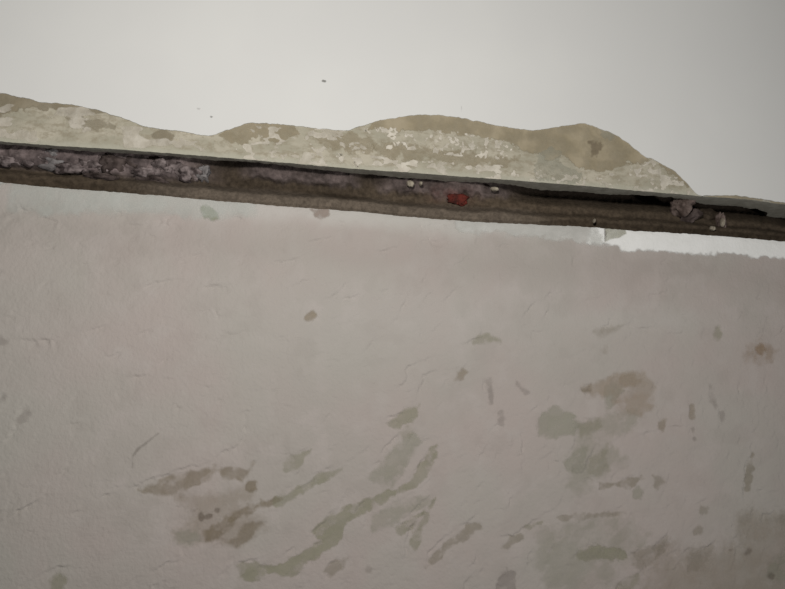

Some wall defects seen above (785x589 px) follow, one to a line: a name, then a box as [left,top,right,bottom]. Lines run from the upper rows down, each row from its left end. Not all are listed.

peeling [0,94,784,204]